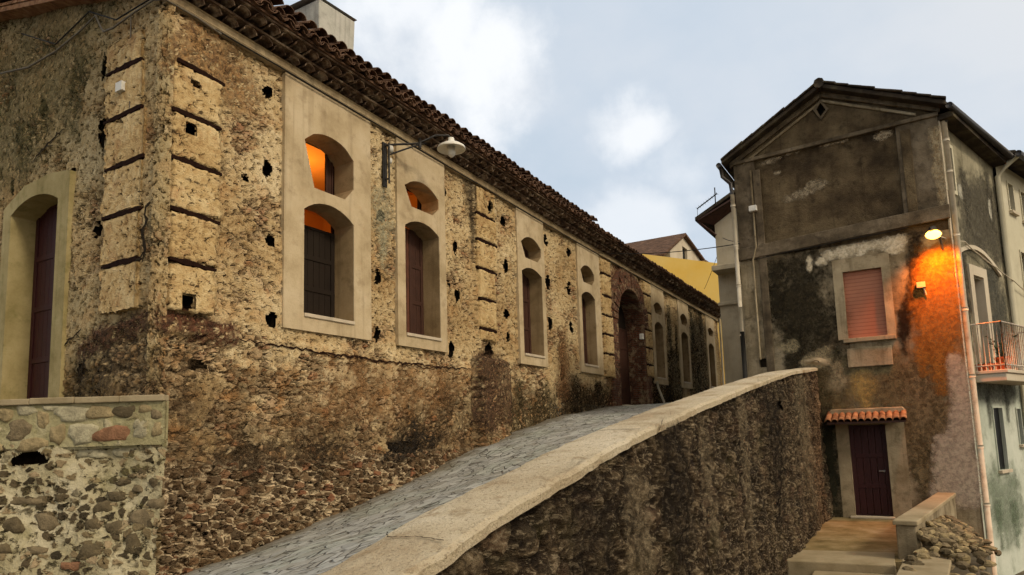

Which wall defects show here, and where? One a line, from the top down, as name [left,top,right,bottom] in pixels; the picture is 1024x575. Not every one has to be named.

crack [136,201,151,262]
peeling [806,235,907,271]
crack [239,339,471,370]
damp [762,232,953,518]